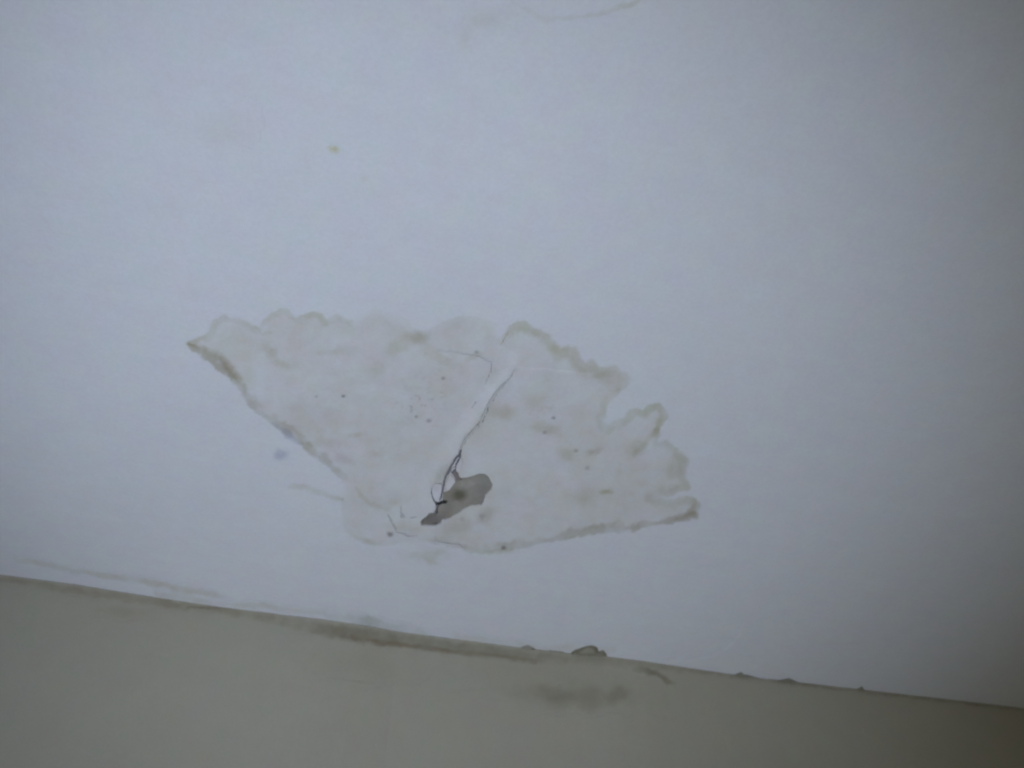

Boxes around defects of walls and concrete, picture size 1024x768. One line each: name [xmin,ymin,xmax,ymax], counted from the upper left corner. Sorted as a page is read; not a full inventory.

water stain [184,305,703,569]
crack [387,331,512,549]
flaking render [421,456,492,525]
water stain [12,556,323,618]
water stain [339,632,704,722]